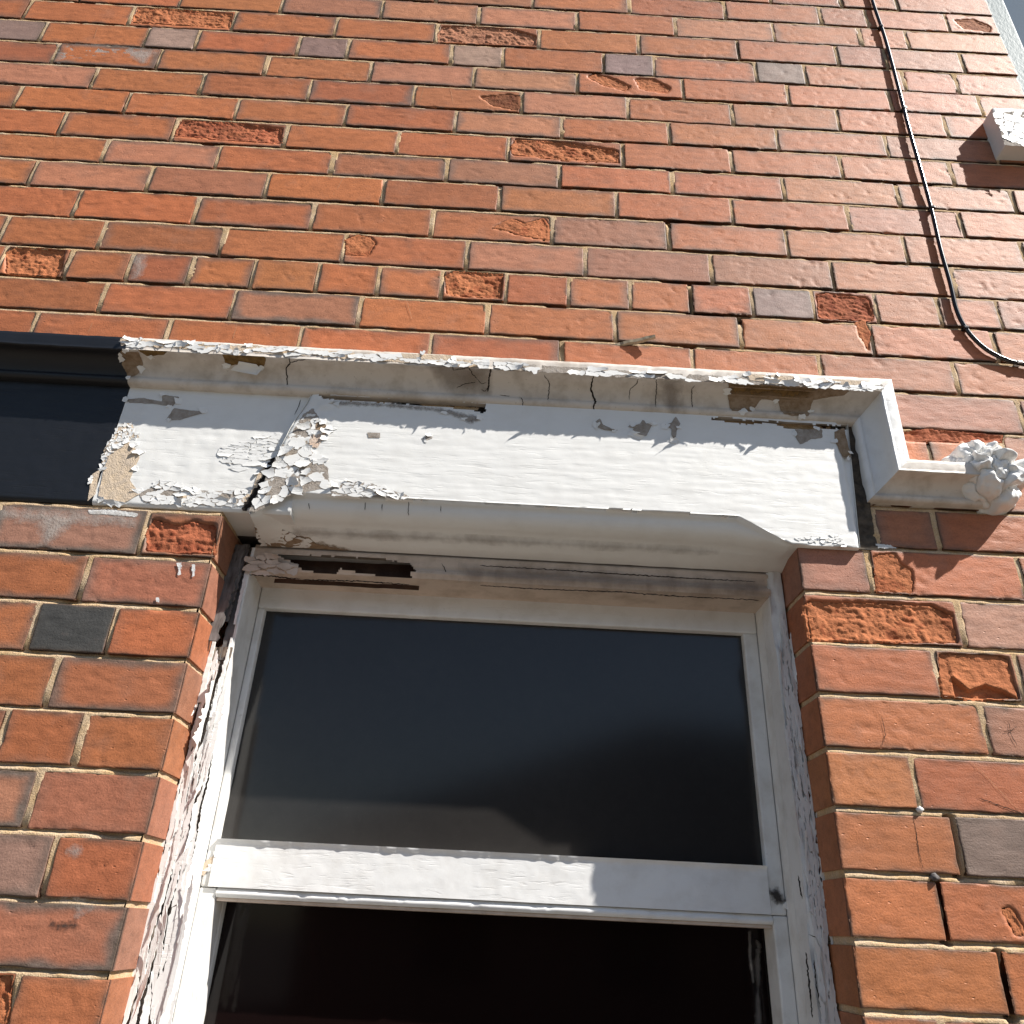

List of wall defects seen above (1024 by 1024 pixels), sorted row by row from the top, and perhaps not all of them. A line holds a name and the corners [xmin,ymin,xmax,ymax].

spalling [174,121,283,144]
spalling [510,140,619,163]
spalling [6,247,65,278]
spalling [444,271,504,299]
spalling [815,293,874,350]
peeling [118,335,884,460]
crack [453,368,550,405]
crack [589,376,597,409]
peeling [87,409,409,576]
crack [242,457,275,511]
spalling [801,553,1018,702]
peeling [122,643,231,1024]